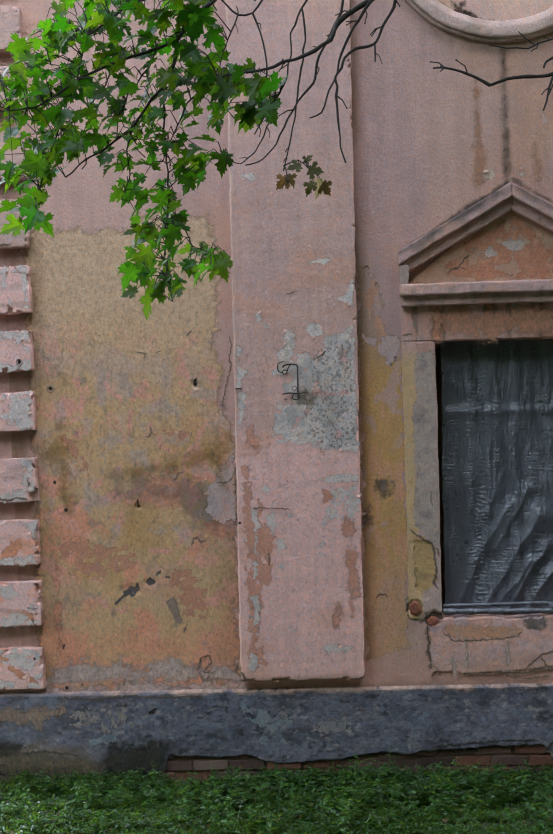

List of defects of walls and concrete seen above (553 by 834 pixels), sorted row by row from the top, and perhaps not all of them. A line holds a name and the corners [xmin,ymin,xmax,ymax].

peeling [445,216,553,282]
peeling [0,206,296,691]
peeling [271,266,523,661]
water stain [38,655,245,692]
crack [426,624,522,673]
crack [462,651,553,679]
water stain [0,703,135,735]